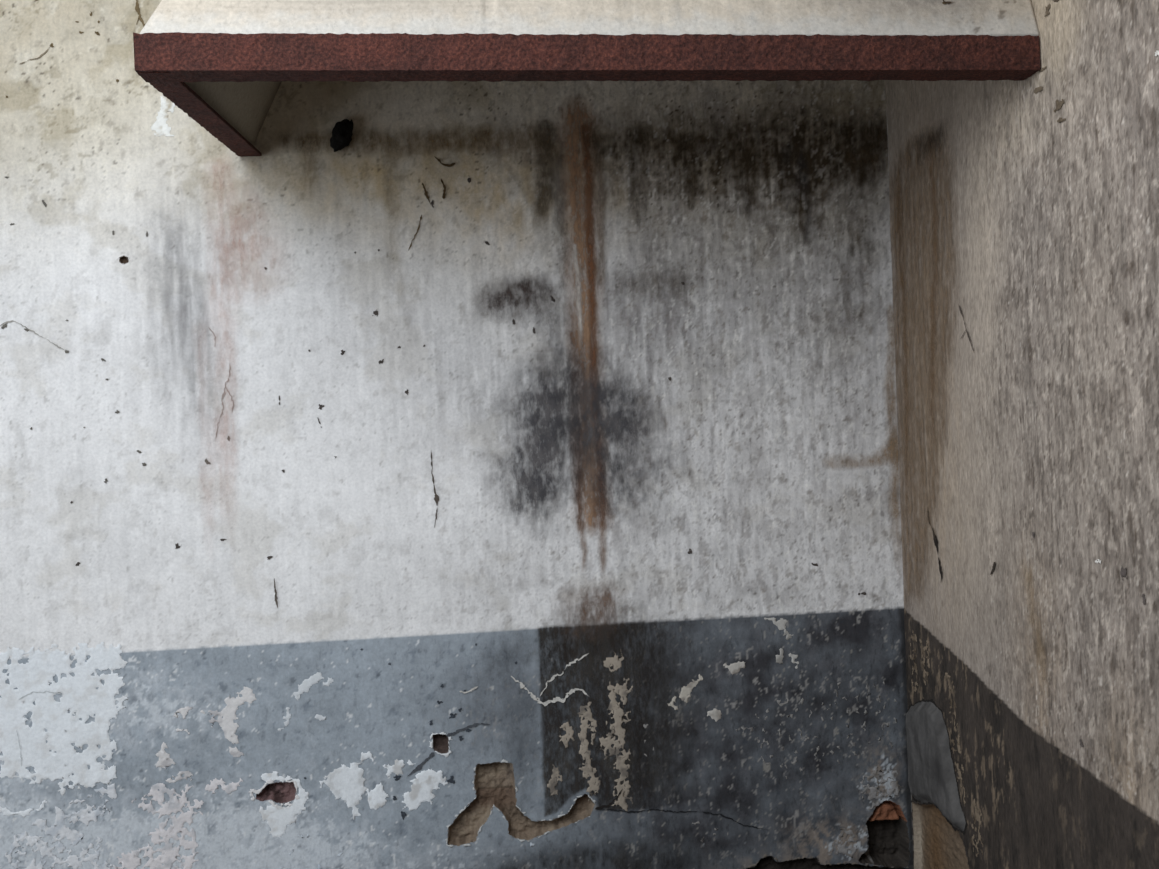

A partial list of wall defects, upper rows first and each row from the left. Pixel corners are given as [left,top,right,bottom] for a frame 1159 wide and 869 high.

crack [135,0,145,26]
damp [350,124,563,232]
damp [573,244,582,331]
corrosion [562,103,606,563]
corrosion [580,589,615,623]
peeling [723,661,745,675]
peeling [910,630,930,694]
peeling [0,642,455,869]
flaking render [429,720,471,757]
flaking render [445,649,654,847]
peeling [707,708,722,722]
flaking render [736,673,983,869]